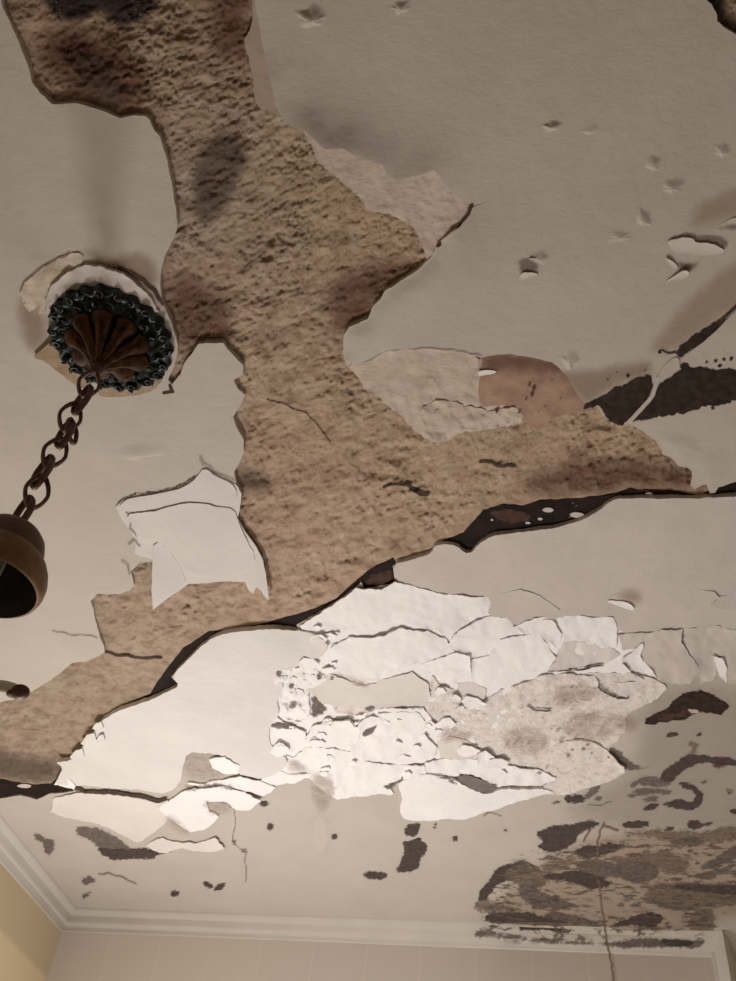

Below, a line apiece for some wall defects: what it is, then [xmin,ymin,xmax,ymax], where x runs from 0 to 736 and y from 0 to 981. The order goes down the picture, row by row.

spalling [0,0,736,784]
water stain [489,359,558,381]
peeling [50,581,736,843]
water stain [645,690,729,737]
crack [74,788,167,803]
water stain [34,834,54,855]
water stain [76,826,165,860]
peeling [145,837,226,853]
water stain [364,823,428,880]
water stain [474,733,736,949]